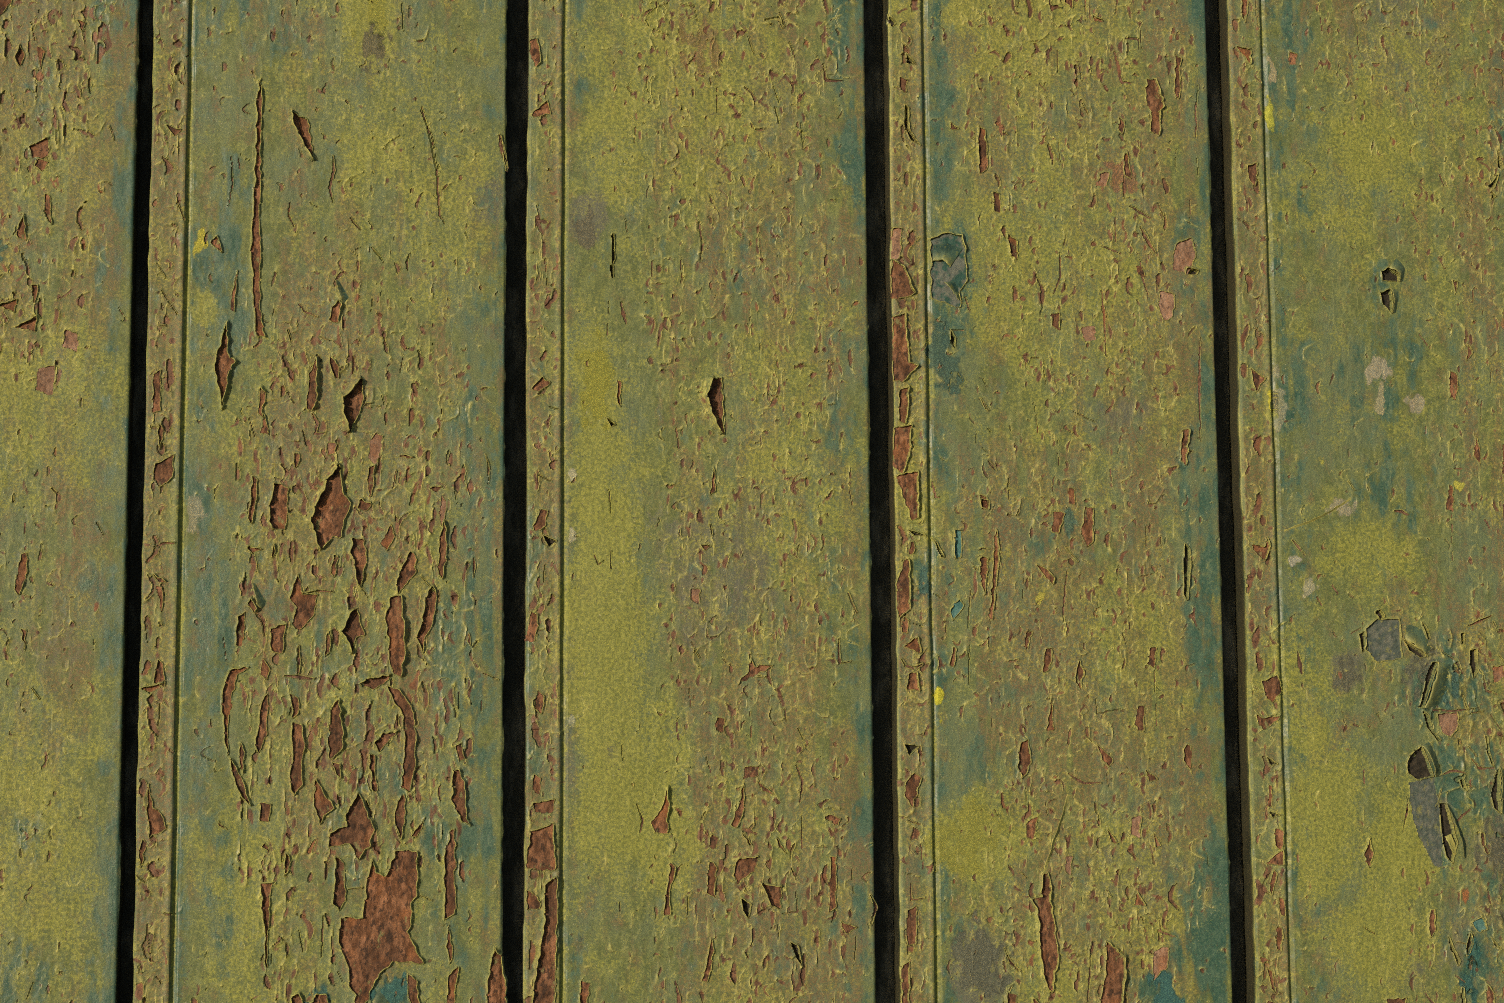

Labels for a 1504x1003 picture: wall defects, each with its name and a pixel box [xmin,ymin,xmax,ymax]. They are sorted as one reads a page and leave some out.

peeling [290,109,315,161]
peeling [247,475,289,559]
peeling [221,574,318,822]
peeling [306,356,395,587]
peeling [260,486,448,1003]
peeling [705,376,725,435]
peeling [890,227,968,520]
peeling [895,529,1000,653]
peeling [1358,609,1504,868]
peeling [443,742,471,1003]
peeling [486,947,508,1003]
peeling [1006,855,1073,1003]